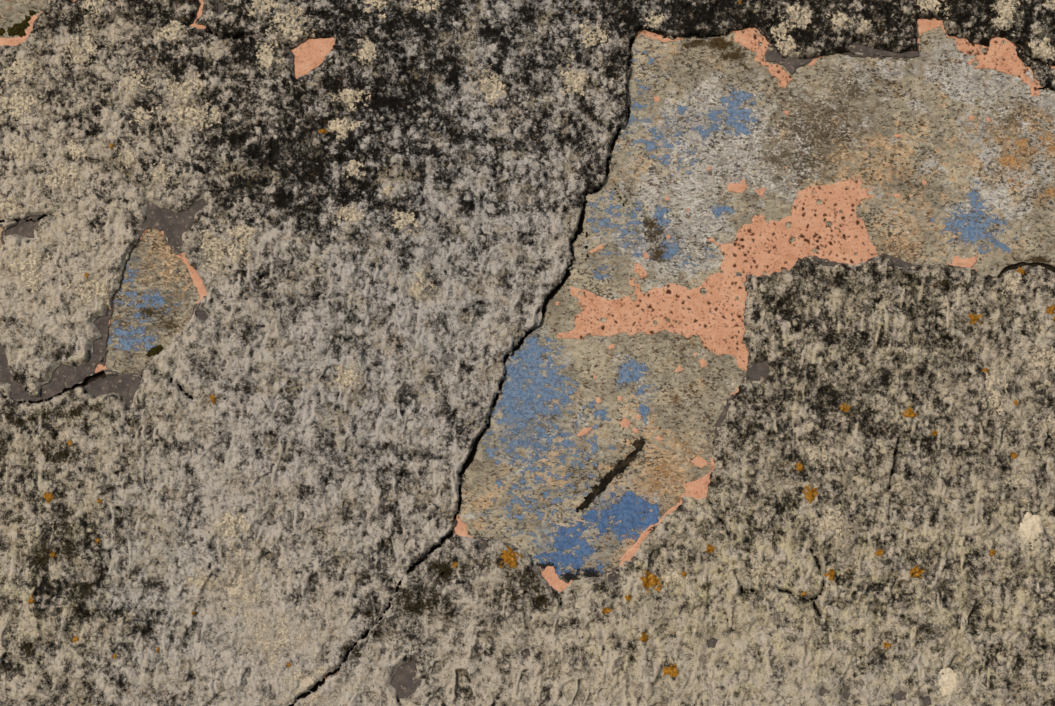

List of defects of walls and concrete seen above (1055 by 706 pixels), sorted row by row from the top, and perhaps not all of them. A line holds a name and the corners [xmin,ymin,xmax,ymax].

flaking render [0,0,47,46]
peeling [290,37,335,79]
flaking render [0,198,209,407]
crack [289,32,724,706]
flaking render [447,17,1055,598]
crack [997,262,1055,279]